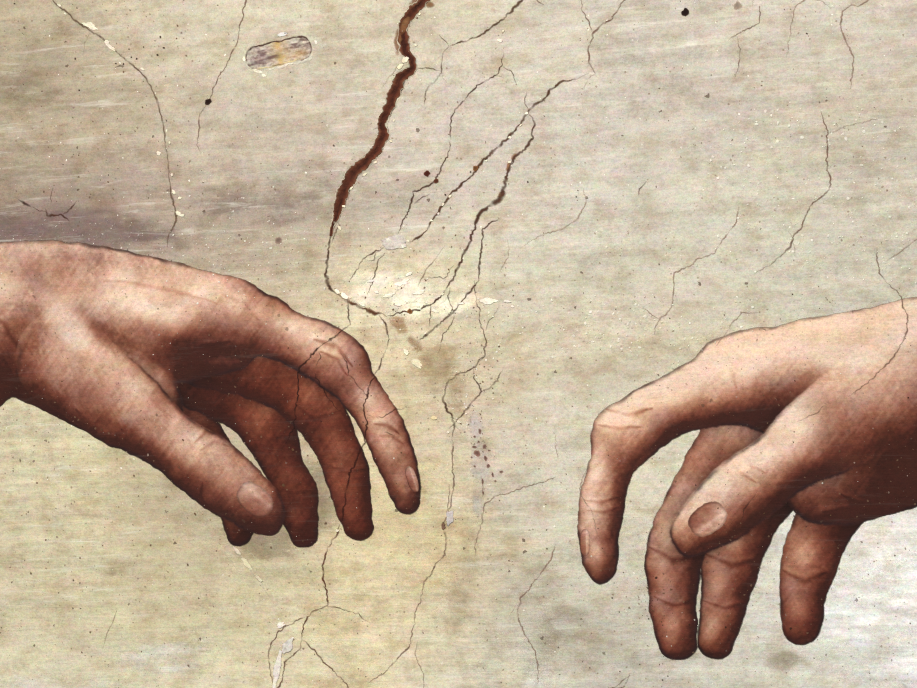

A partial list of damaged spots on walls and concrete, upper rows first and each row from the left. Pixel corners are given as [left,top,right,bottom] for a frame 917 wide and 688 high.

crack [211,0,247,96]
crack [582,0,624,61]
crack [840,0,868,79]
crack [53,1,184,237]
crack [781,116,831,256]
crack [650,213,738,316]
crack [269,0,571,688]